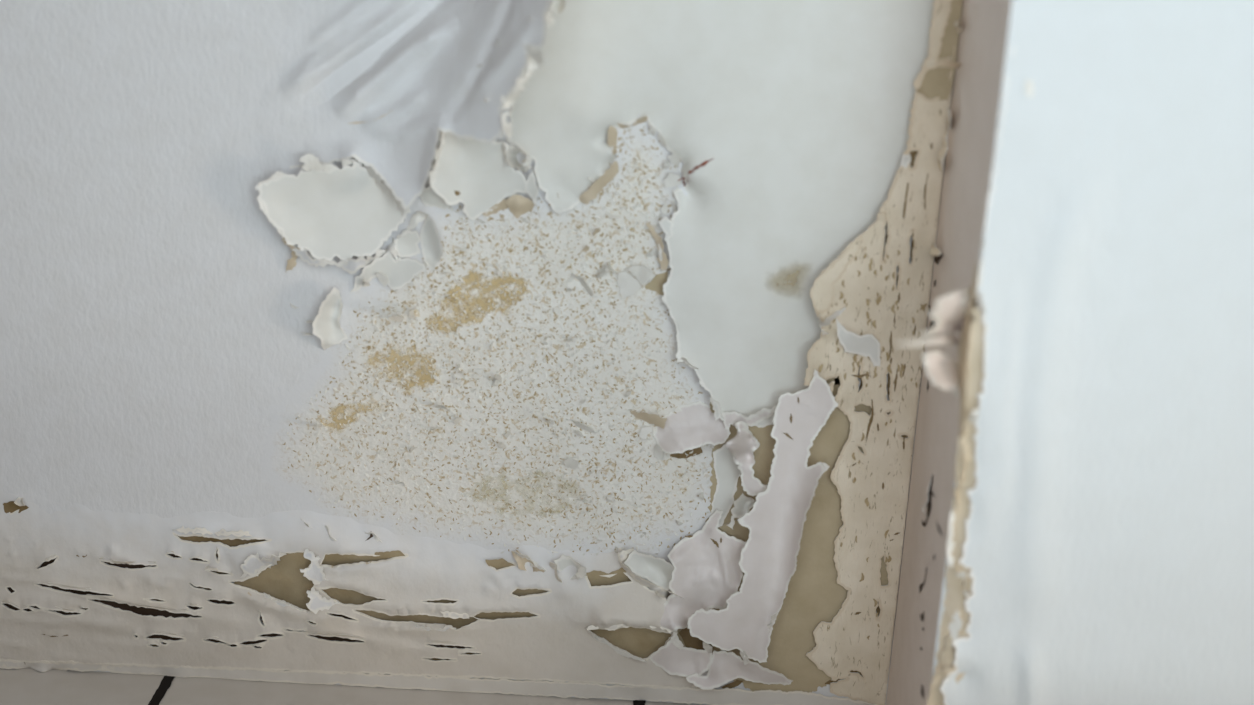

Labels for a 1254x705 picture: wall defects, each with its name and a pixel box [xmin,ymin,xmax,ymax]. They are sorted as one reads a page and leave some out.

damp [428,271,526,332]
damp [369,349,437,388]
peeling [255,0,961,692]
damp [321,404,372,429]
flaking render [888,264,986,705]